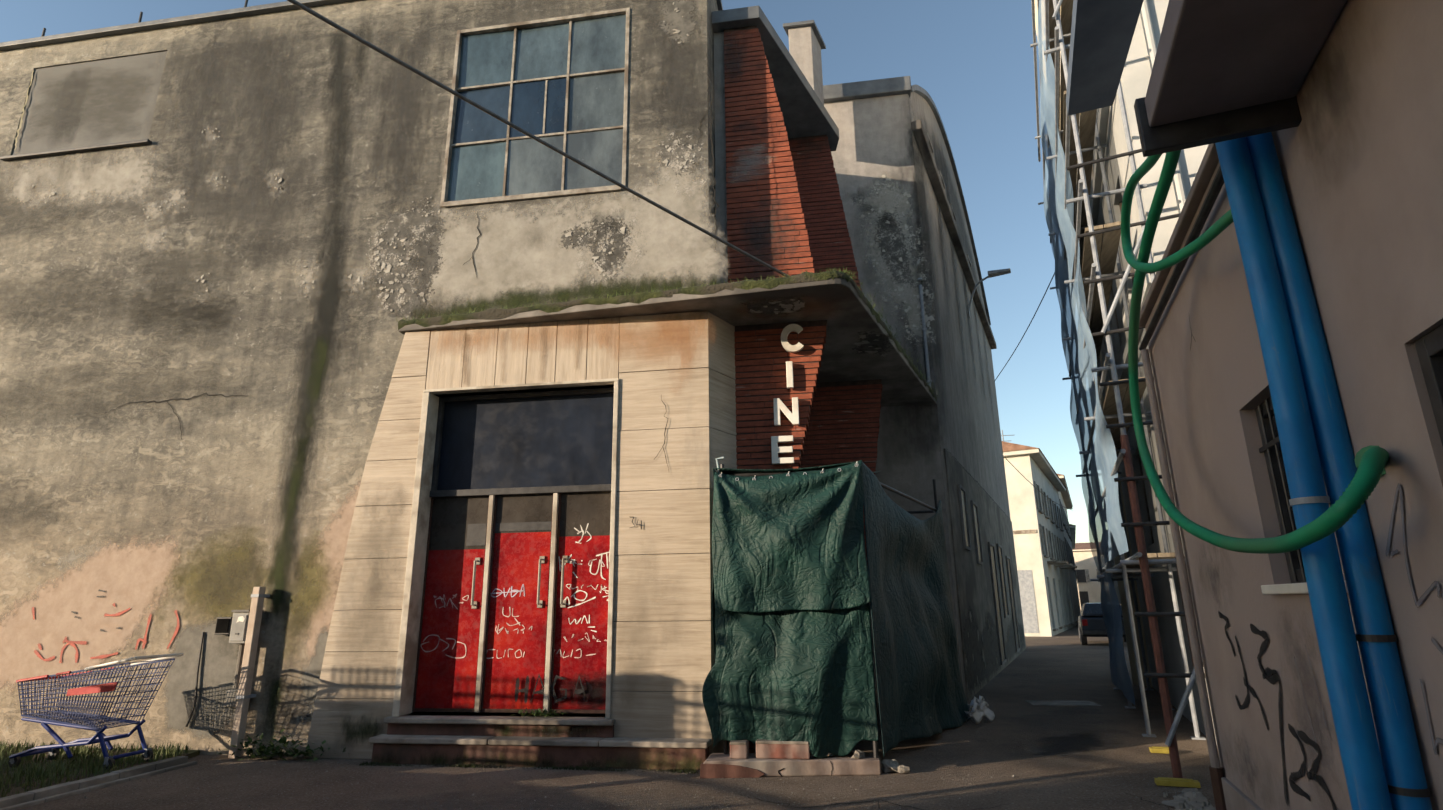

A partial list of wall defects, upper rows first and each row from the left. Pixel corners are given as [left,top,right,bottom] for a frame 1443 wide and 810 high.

flaking render [561,208,646,286]
leakage [267,34,365,615]
crack [105,392,243,439]
crack [654,398,669,470]